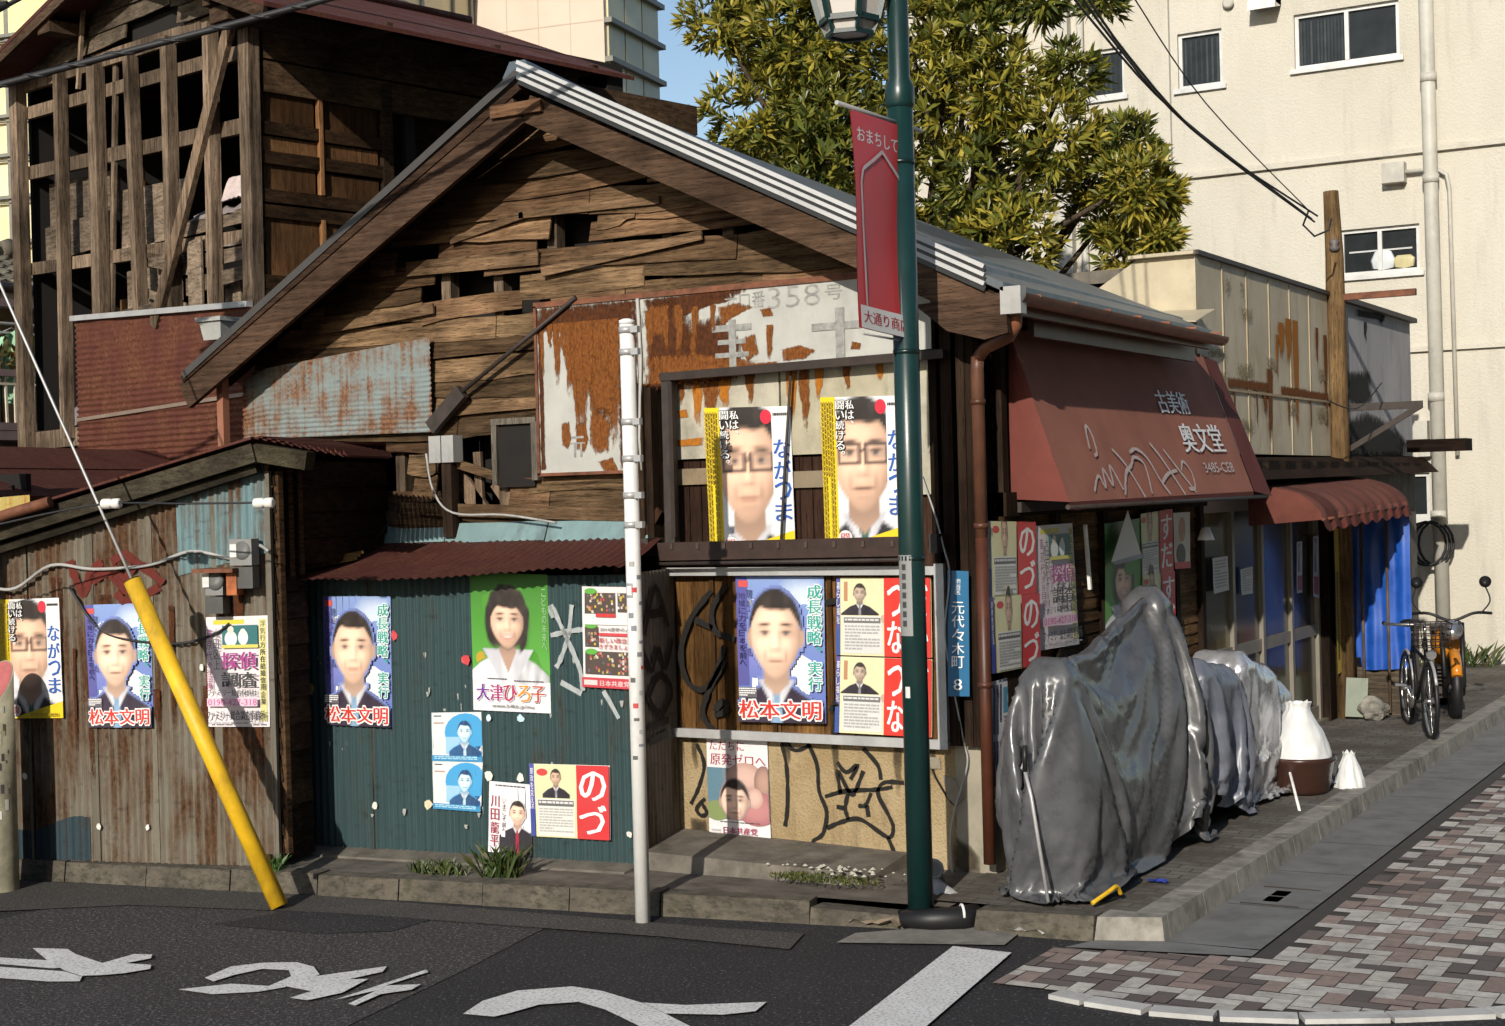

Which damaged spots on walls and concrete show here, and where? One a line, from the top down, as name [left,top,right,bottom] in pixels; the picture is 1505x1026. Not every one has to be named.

corrosion [677,374,755,447]
corrosion [786,369,824,426]
corrosion [843,366,851,388]
corrosion [1228,318,1332,437]